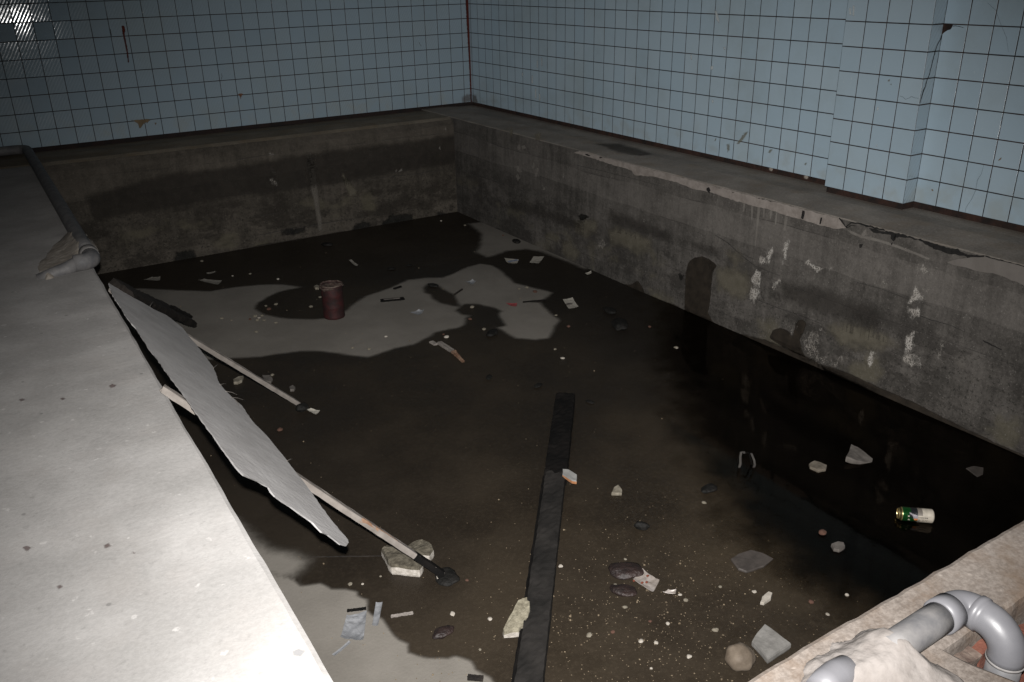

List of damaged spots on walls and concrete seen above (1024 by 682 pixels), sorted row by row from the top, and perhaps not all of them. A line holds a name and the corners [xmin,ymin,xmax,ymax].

spalling [0,105,1024,455]
water stain [97,212,1024,682]
crack [839,218,885,231]
crack [901,35,942,102]